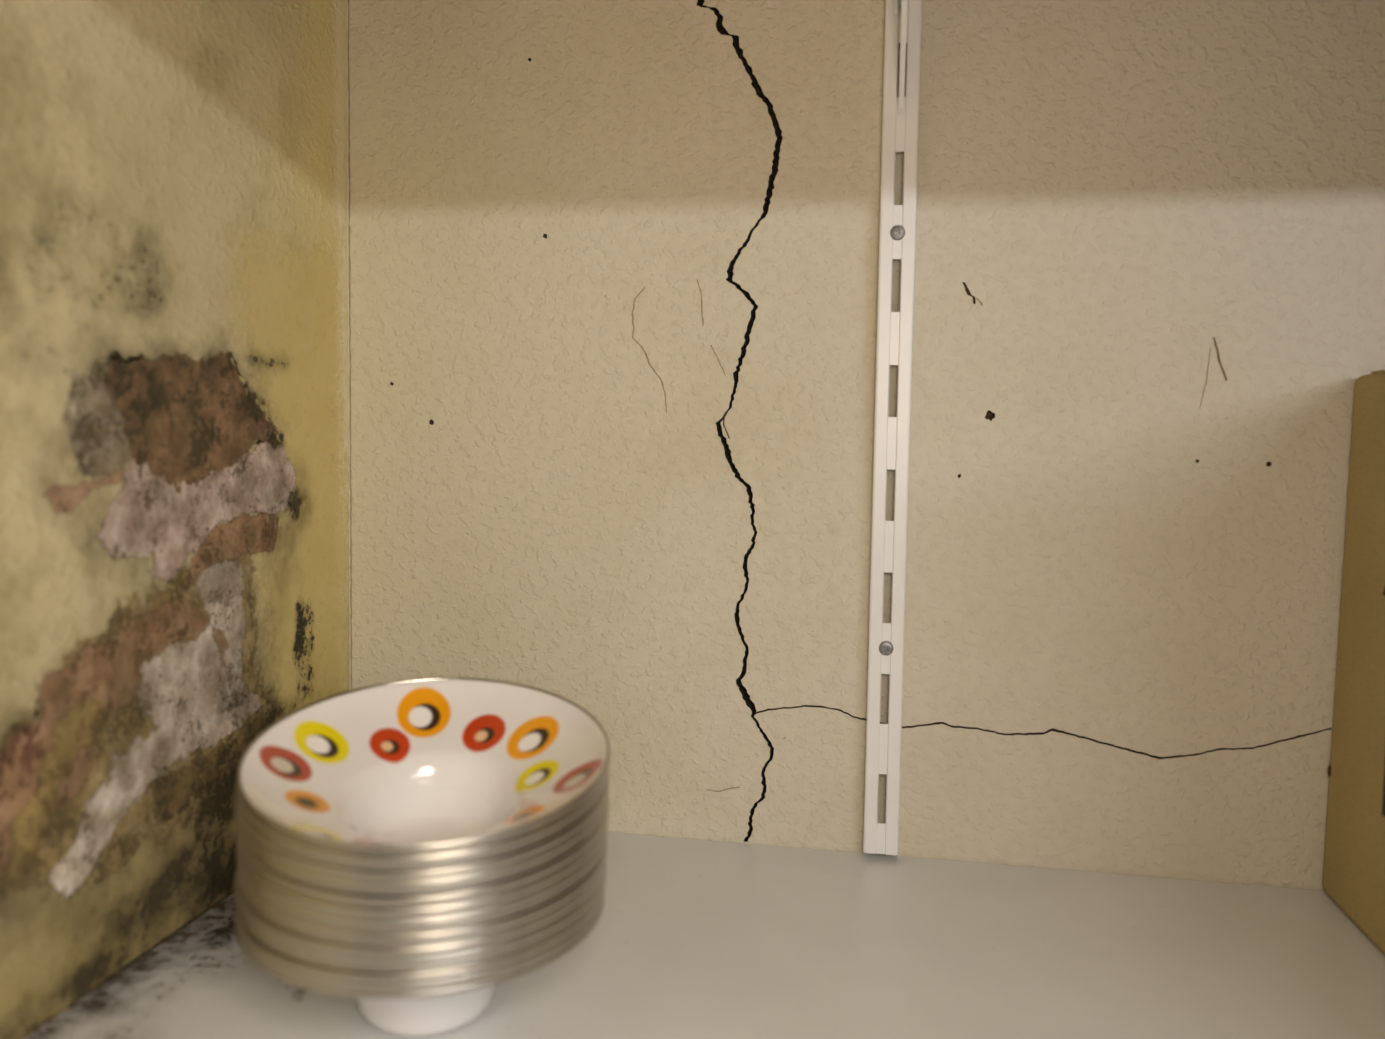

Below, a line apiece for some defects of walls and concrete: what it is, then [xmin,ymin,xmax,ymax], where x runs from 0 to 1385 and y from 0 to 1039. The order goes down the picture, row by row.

peeling [0,351,296,903]
damp [19,564,315,1039]
damp [235,355,288,449]
damp [262,488,309,568]
crack [631,287,667,413]
crack [697,0,1331,842]